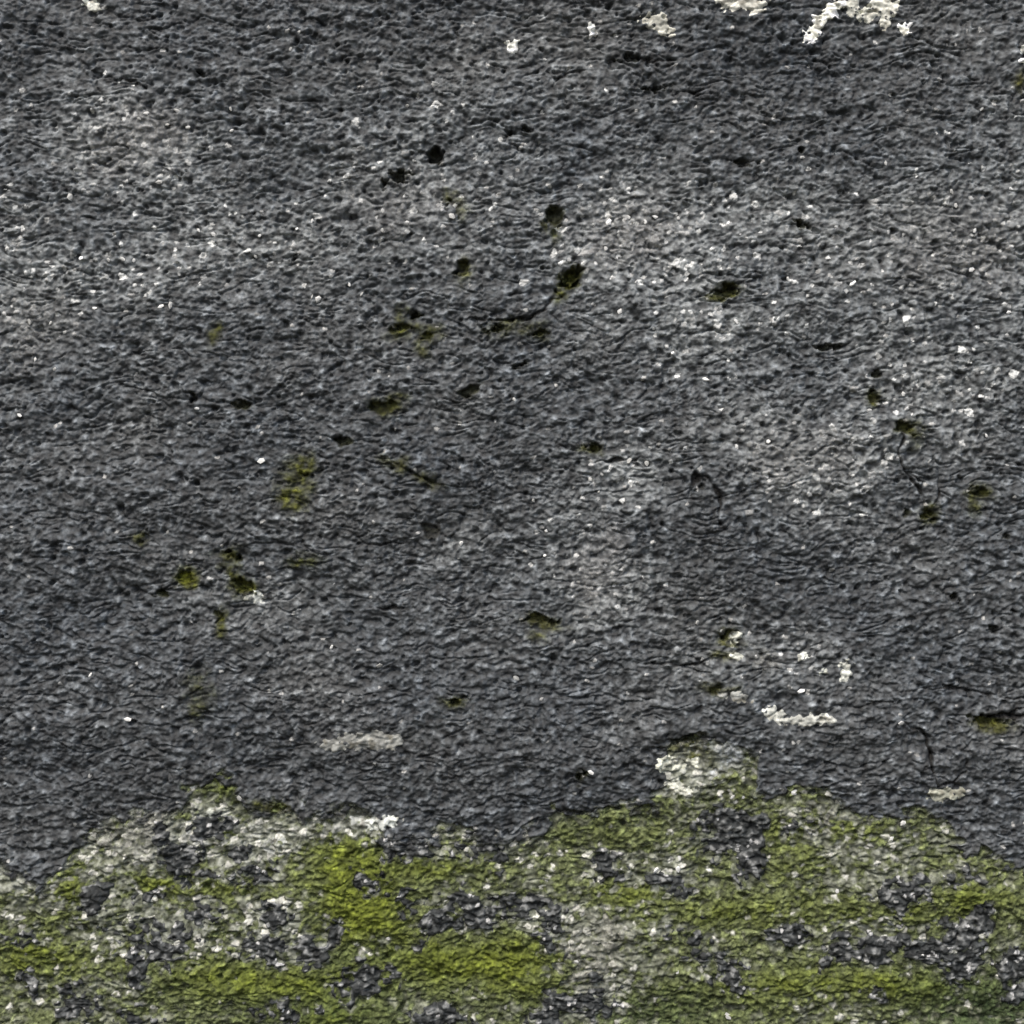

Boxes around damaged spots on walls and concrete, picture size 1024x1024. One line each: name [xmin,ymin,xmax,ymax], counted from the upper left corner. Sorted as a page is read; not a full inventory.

spalling [0,730,1024,1024]